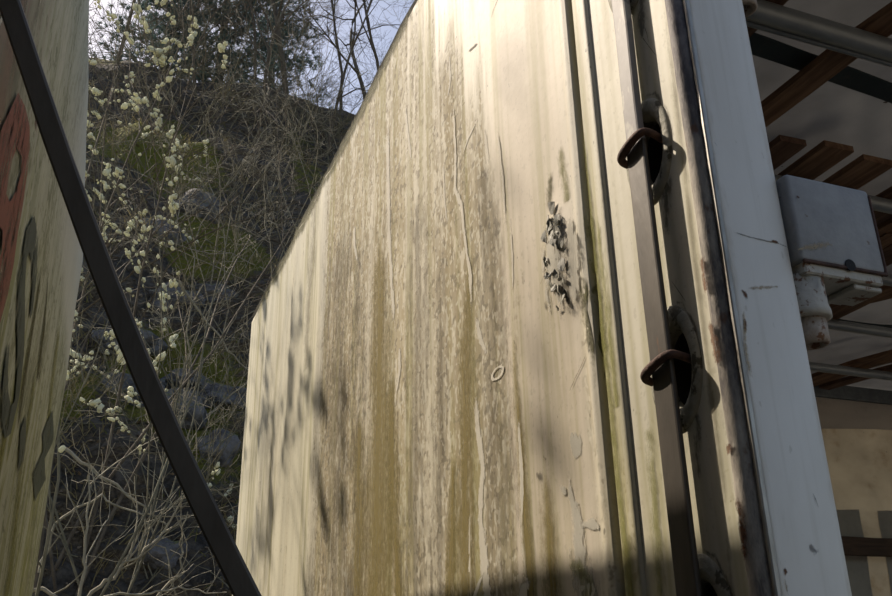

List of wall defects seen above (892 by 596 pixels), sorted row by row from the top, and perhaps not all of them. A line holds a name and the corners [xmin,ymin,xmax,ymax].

damp [386,129,395,323]
damp [443,104,478,302]
damp [475,319,487,353]
damp [548,152,569,202]
spalling [540,202,580,317]
damp [351,422,365,596]
damp [387,349,401,596]
damp [445,465,455,596]
damp [468,398,491,596]
damp [517,422,530,596]
damp [543,484,557,596]